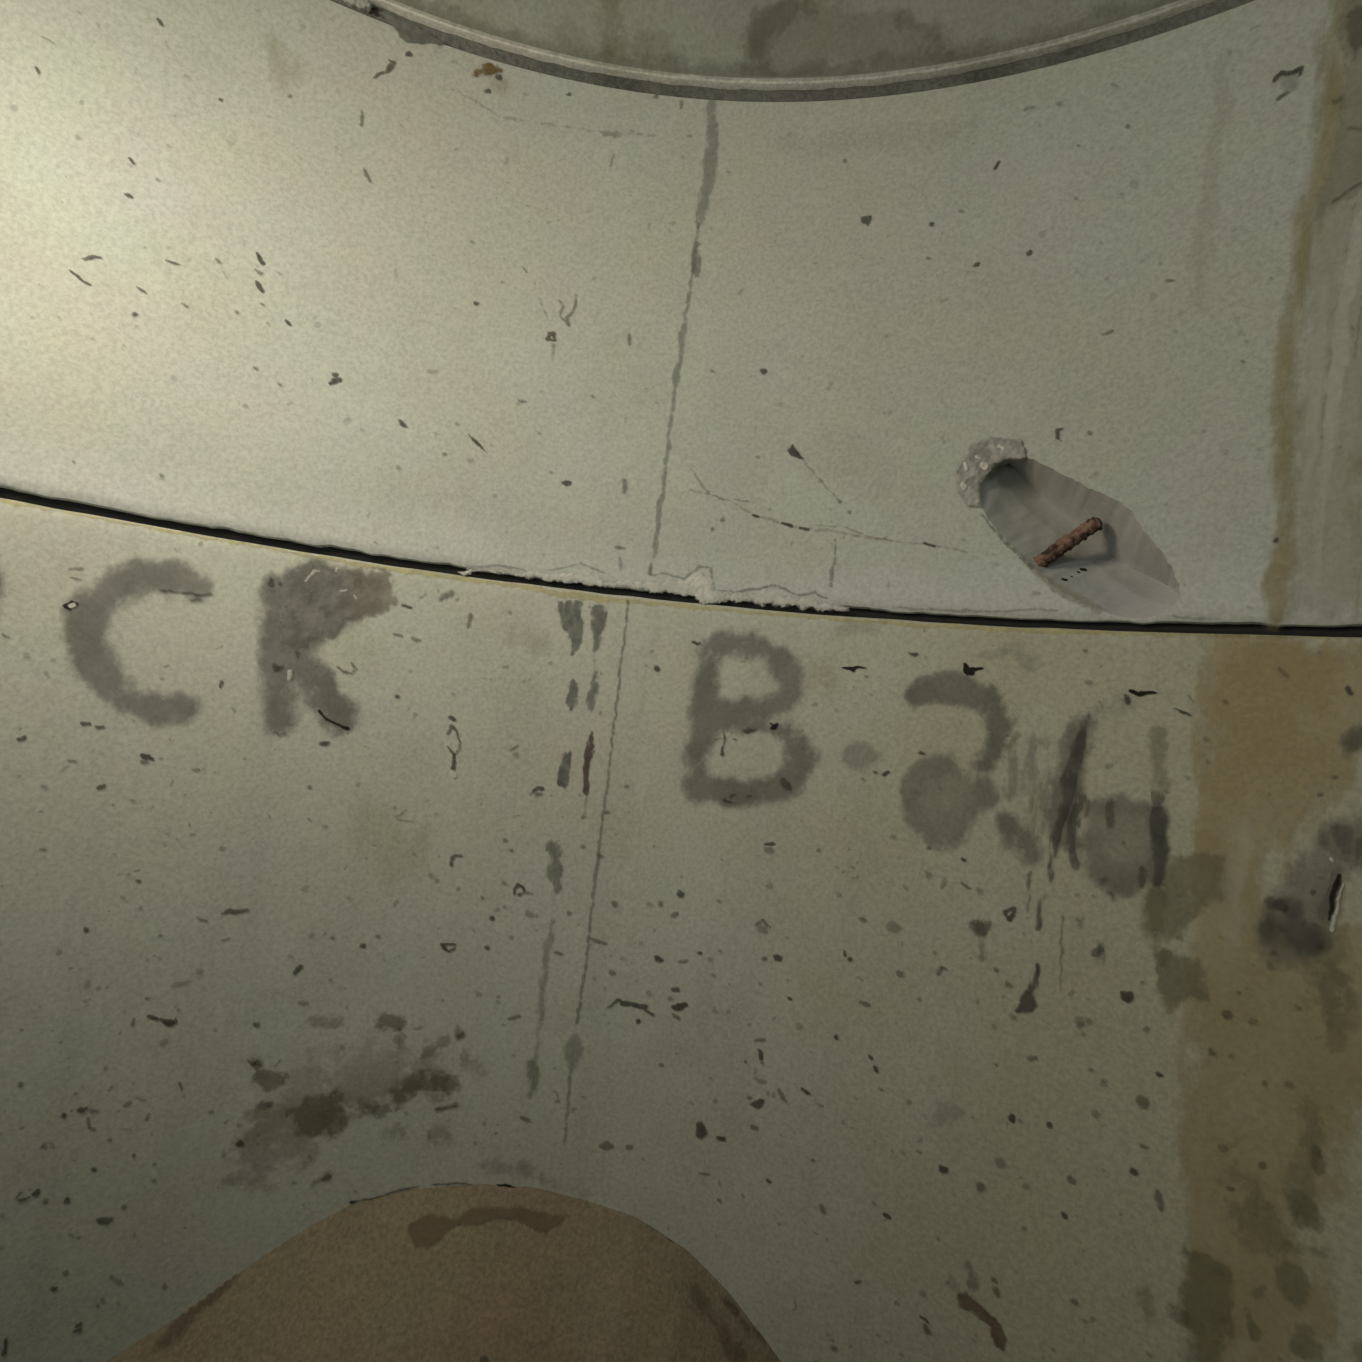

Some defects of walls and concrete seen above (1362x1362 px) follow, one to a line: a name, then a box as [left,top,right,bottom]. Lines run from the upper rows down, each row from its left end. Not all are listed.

rust [1033,517,1103,567]
damp [1197,634,1362,866]